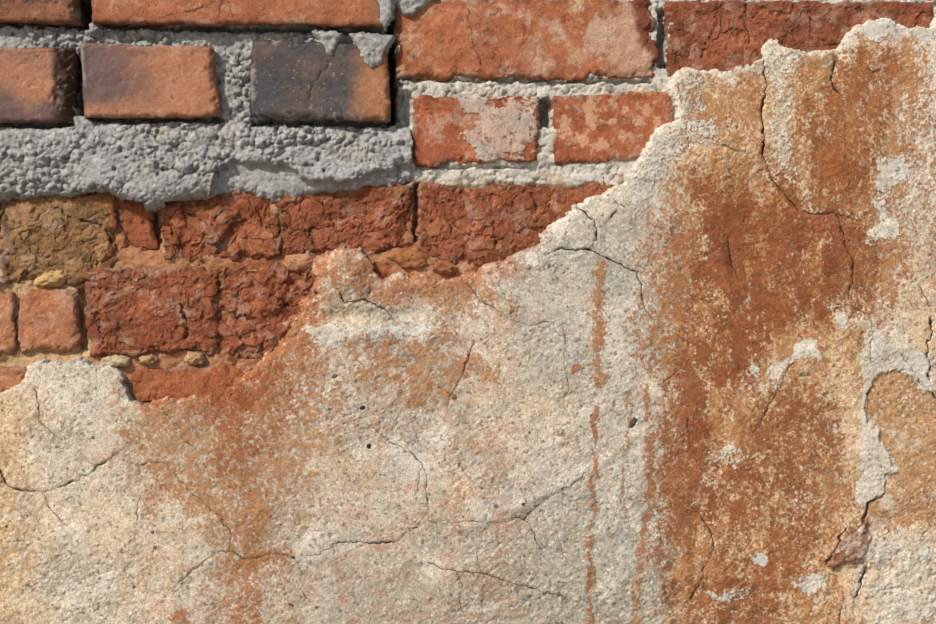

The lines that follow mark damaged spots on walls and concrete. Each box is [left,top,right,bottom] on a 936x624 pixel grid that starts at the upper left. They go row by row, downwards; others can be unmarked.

spalling [0,0,81,25]
spalling [0,4,936,413]
rust [571,258,612,388]
crack [541,201,654,320]
rust [620,32,936,624]
crack [744,4,873,360]
crack [901,280,936,399]
crack [0,427,591,614]
rust [105,252,526,624]
rust [583,405,599,624]
crack [839,562,868,624]
crack [824,494,884,566]